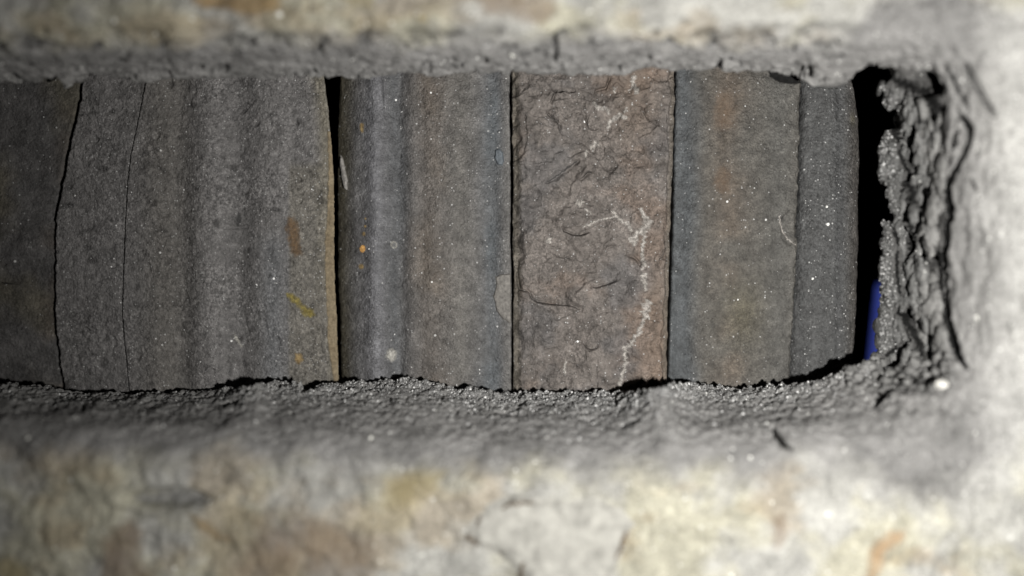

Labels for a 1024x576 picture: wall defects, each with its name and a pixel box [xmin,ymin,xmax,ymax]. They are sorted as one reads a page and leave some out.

crack [122,84,146,390]